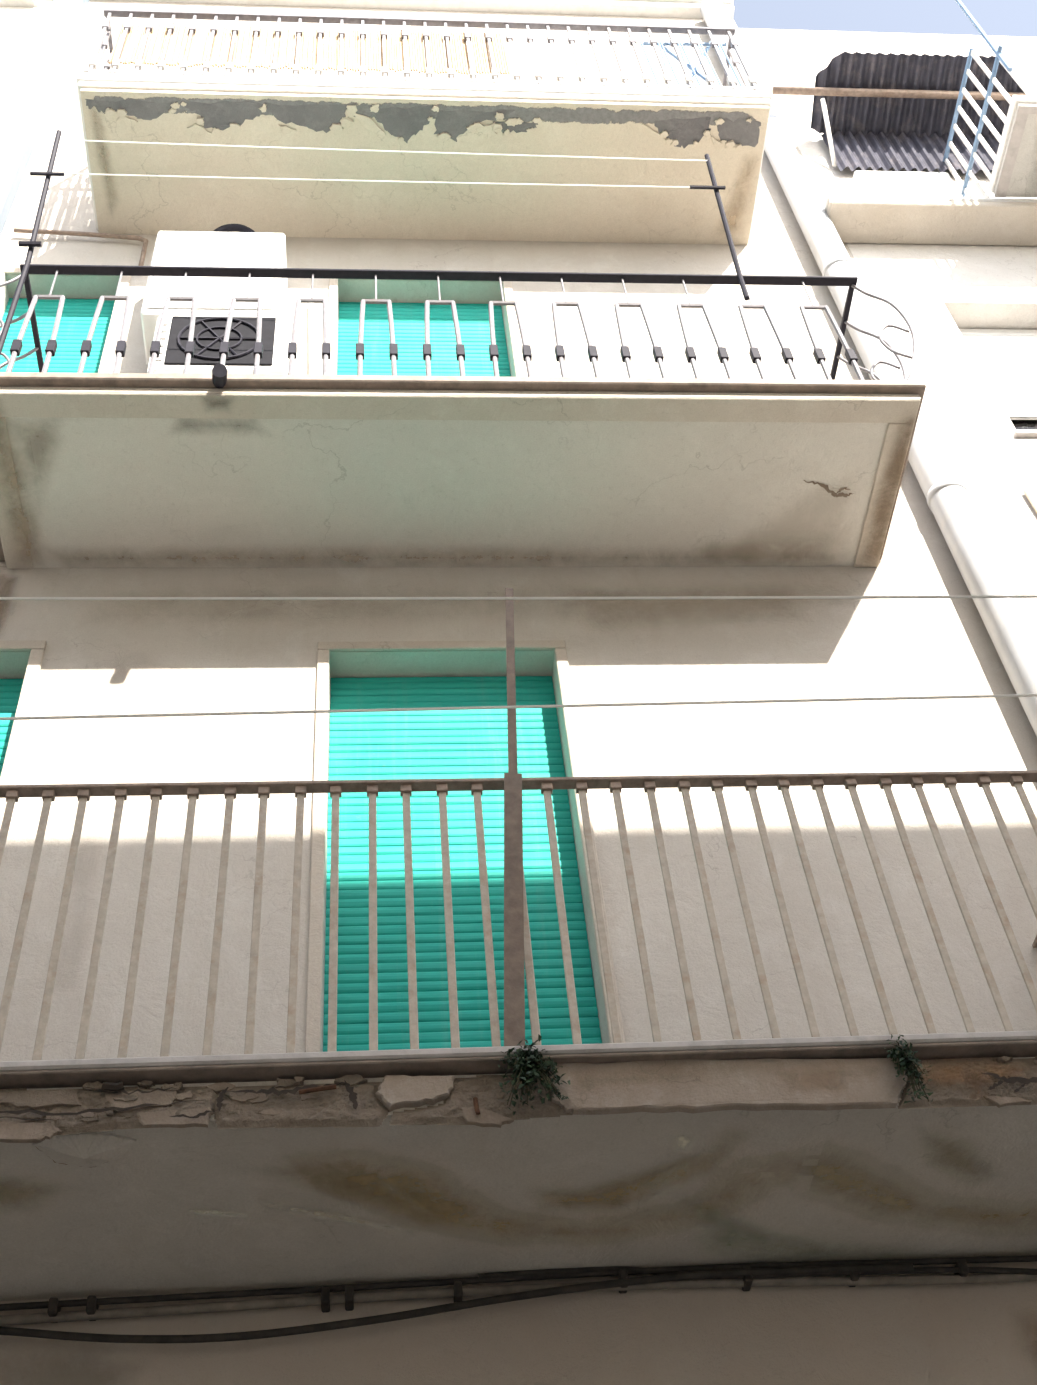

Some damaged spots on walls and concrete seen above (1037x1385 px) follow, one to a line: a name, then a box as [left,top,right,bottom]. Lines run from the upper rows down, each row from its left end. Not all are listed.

peeling [85,98,542,143]
crack [804,480,854,497]
spalling [0,1072,573,1143]
spalling [897,1056,1037,1109]